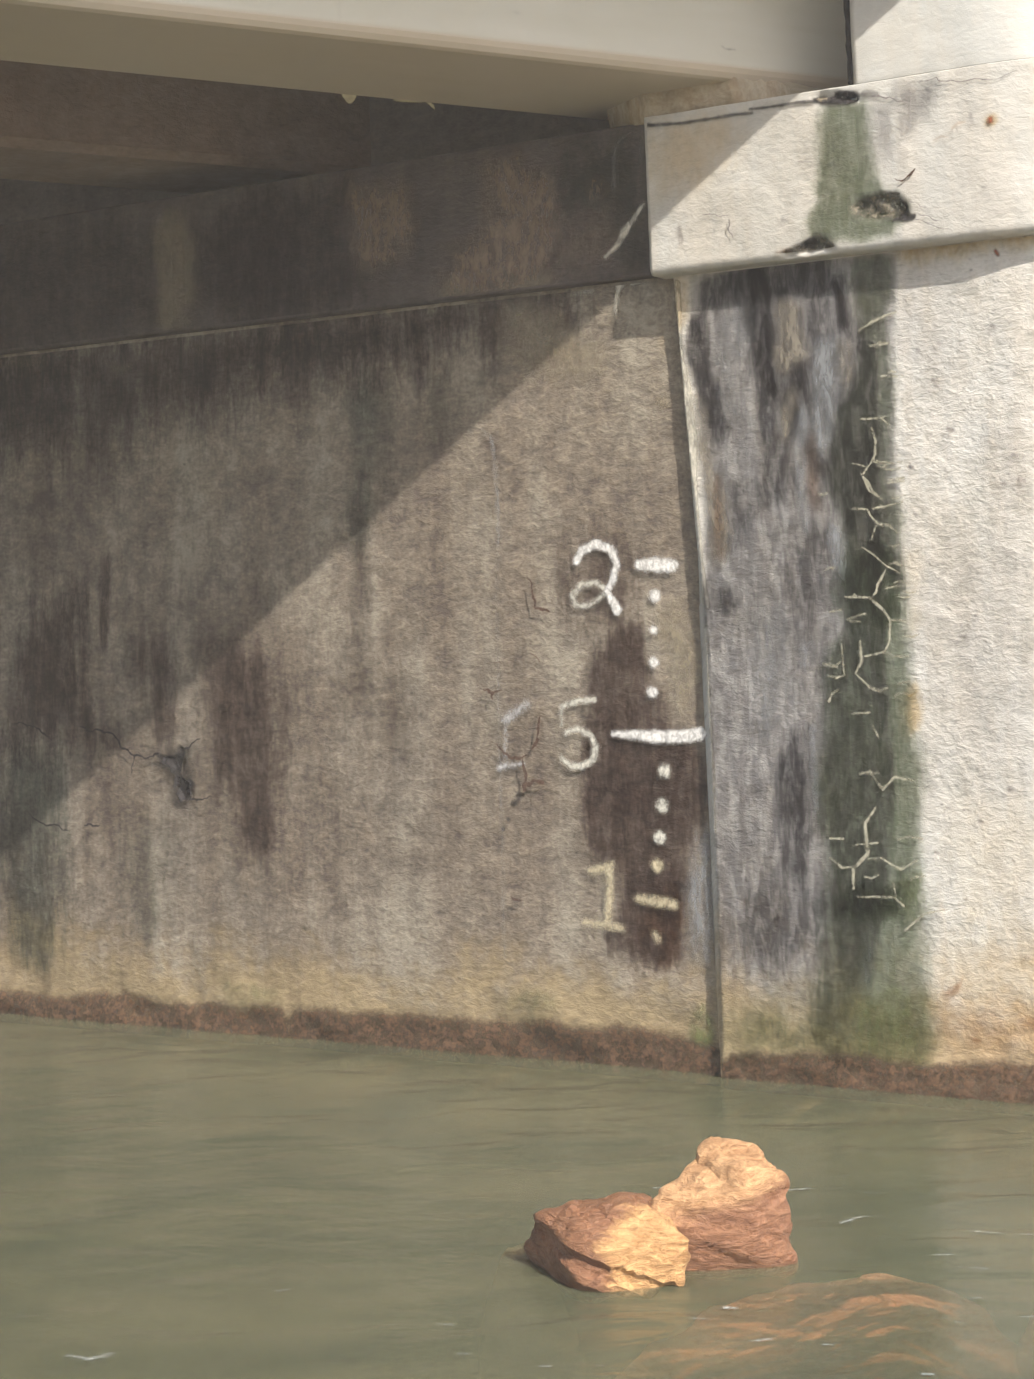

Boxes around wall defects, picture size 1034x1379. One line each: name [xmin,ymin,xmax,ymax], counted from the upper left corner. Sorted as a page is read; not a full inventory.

crack [647,100,818,127]
crack [872,70,1017,102]
water stain [604,203,645,258]
spalling [851,192,948,229]
water stain [752,272,849,449]
crack [860,311,897,377]
water stain [674,280,727,609]
crack [825,416,919,738]
crack [14,722,212,802]
water stain [0,528,1034,1116]
crack [830,770,944,931]